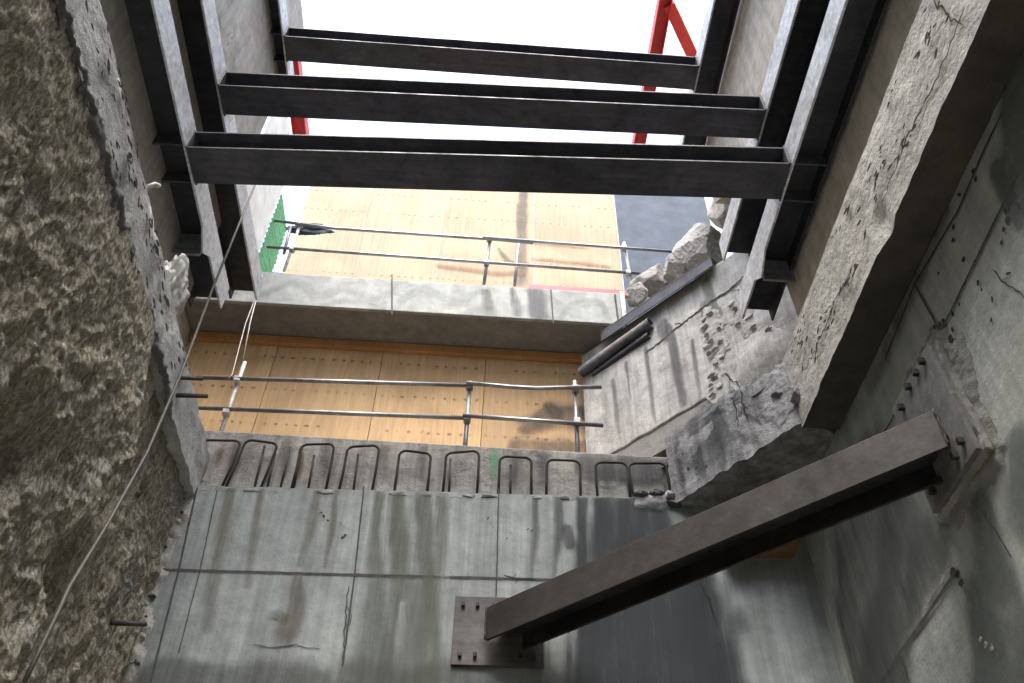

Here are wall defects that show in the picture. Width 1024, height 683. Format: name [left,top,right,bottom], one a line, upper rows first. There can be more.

crack [882,0,965,202]
spalling [54,0,208,428]
leakage [658,319,686,404]
crack [647,276,743,352]
spalling [699,285,772,401]
crack [725,373,749,426]
crack [253,586,352,664]
leakage [138,491,474,683]